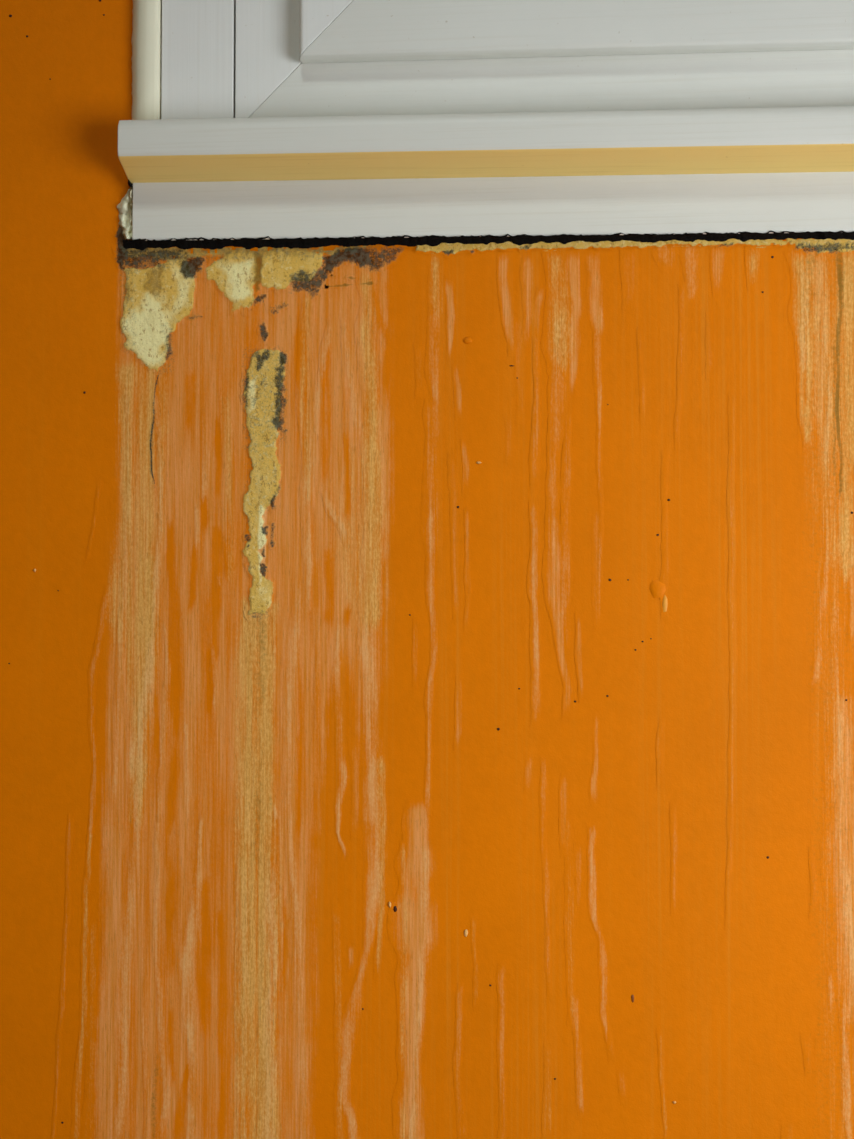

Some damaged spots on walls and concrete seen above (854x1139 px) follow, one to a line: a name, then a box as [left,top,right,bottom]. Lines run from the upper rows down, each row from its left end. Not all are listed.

crack [149,370,160,491]
peeling [118,247,325,375]
peeling [239,346,289,626]
leakage [51,220,854,1139]